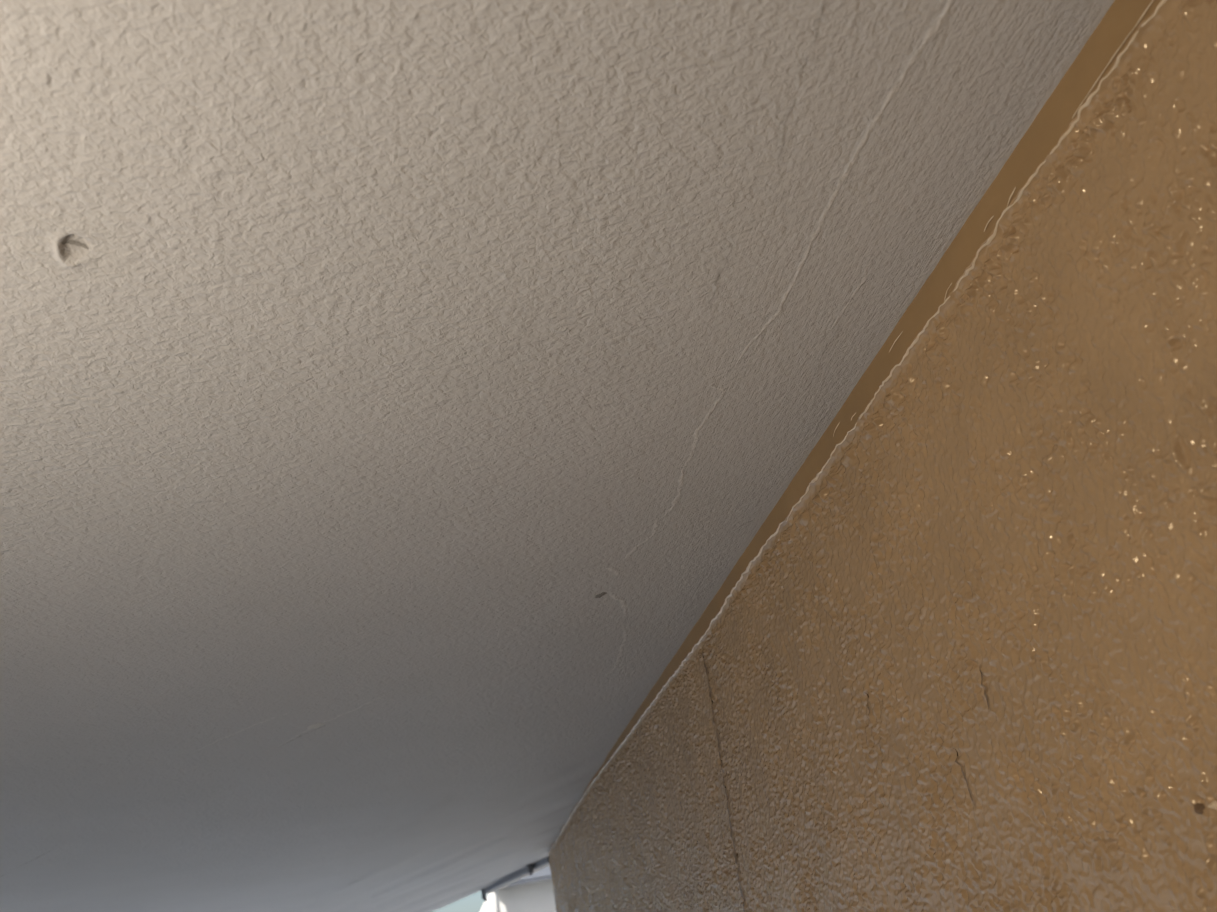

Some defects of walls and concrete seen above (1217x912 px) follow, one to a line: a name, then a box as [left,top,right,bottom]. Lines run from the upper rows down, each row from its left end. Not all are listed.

crack [604,0,956,679]
crack [702,650,746,912]